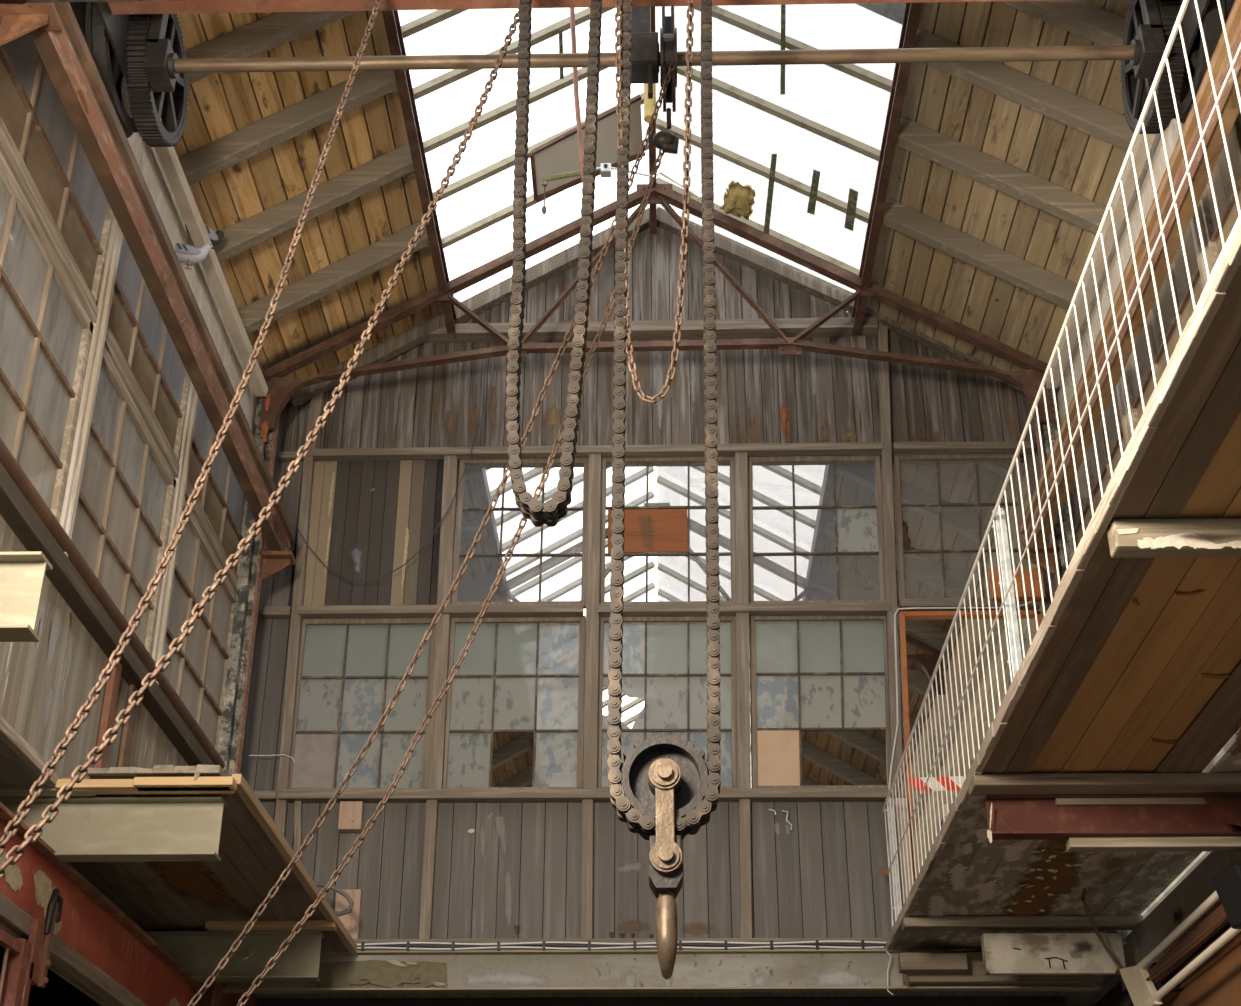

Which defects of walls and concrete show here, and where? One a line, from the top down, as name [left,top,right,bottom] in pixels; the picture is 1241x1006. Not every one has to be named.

peeling [1117,528,1241,549]
peeling [0,848,62,936]
peeling [928,827,999,916]
peeling [1001,844,1085,912]